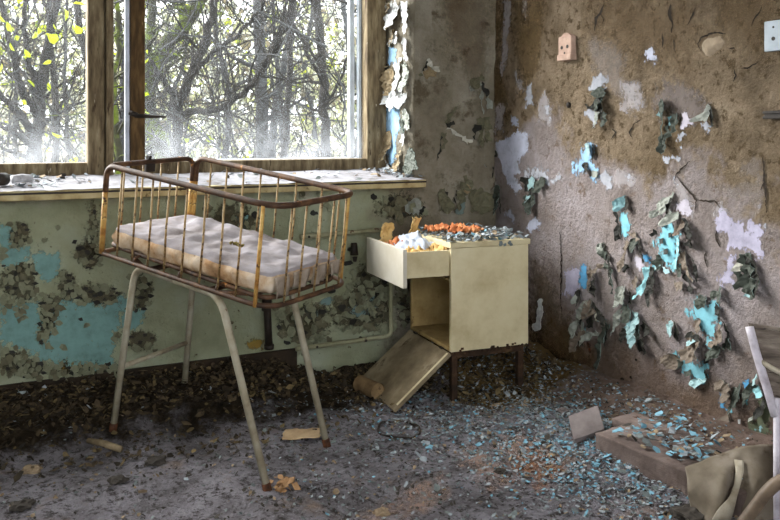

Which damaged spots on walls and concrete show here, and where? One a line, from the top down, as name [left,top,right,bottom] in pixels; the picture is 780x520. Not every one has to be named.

peeling [9,173,92,188]
peeling [70,200,106,270]
peeling [202,201,264,231]
peeling [280,0,440,180]
spalling [371,73,561,246]
peeling [571,142,613,191]
peeling [584,73,609,129]
peeling [655,99,714,164]
crack [674,161,720,209]
peeling [0,221,158,383]
peeling [250,176,773,520]